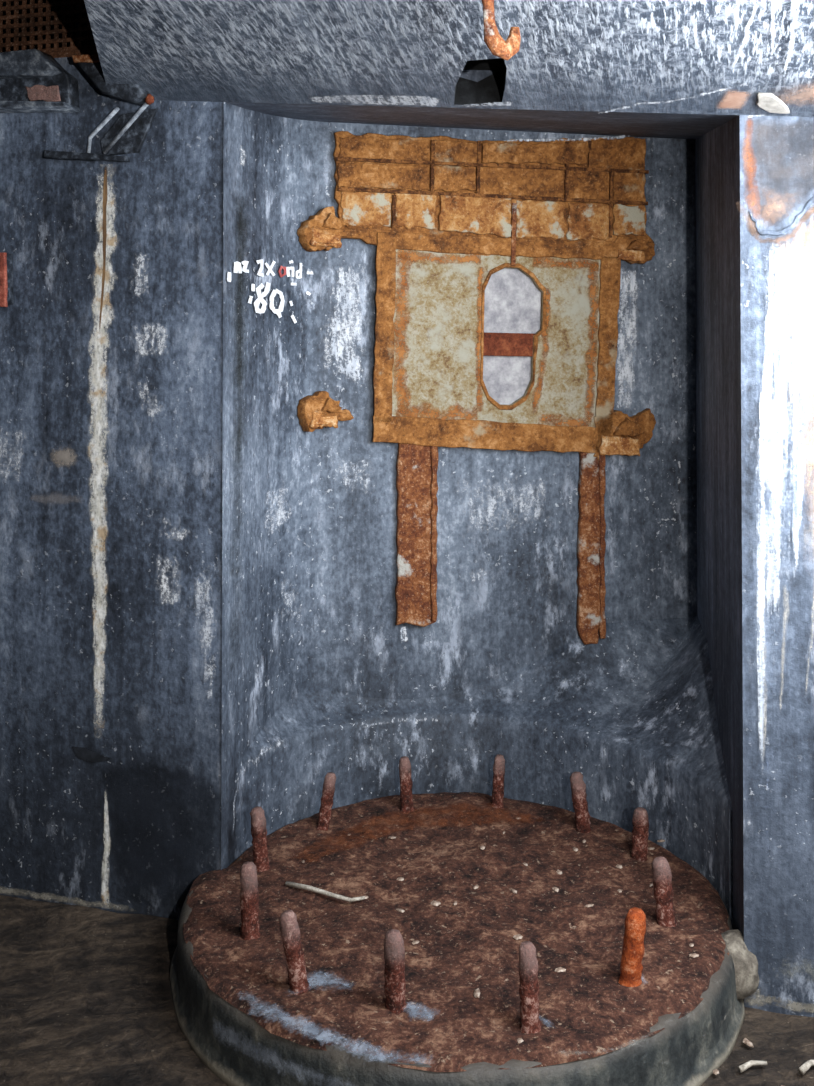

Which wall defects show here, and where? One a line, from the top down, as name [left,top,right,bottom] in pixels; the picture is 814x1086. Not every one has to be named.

leakage [88,169,117,717]
leakage [757,247,814,758]
rust [183,792,730,1072]
leakage [748,990,814,1013]